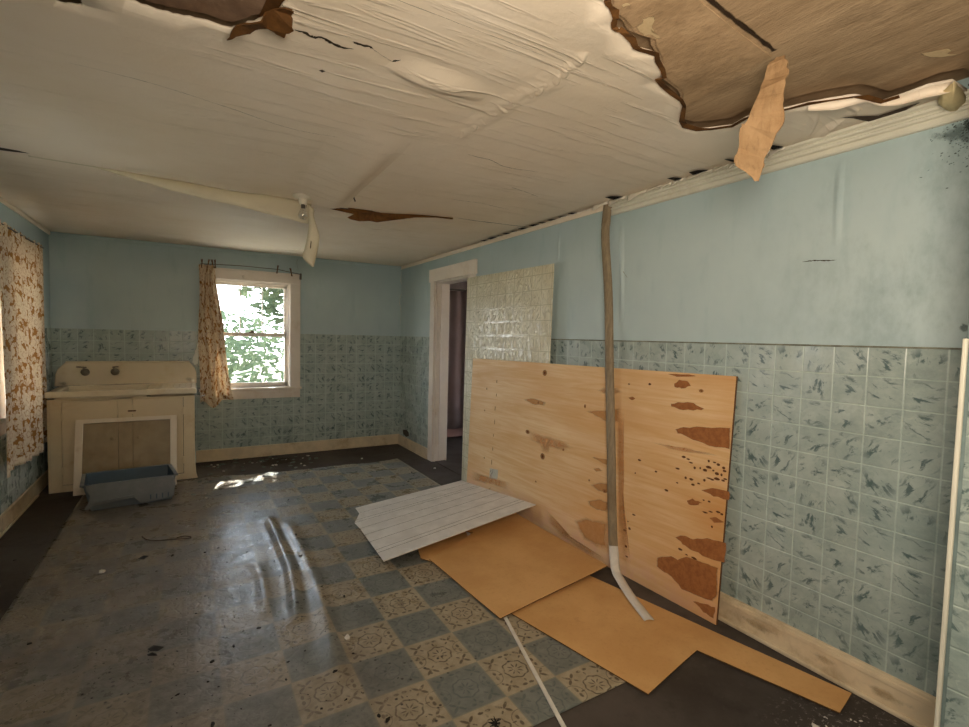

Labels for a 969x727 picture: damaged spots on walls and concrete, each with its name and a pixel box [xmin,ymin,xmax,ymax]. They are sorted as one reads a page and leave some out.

peeling [146,0,294,40]
crack [296,30,373,49]
peeling [475,0,969,245]
leakage [932,119,969,167]
peeling [0,147,320,267]
peeling [332,198,453,222]